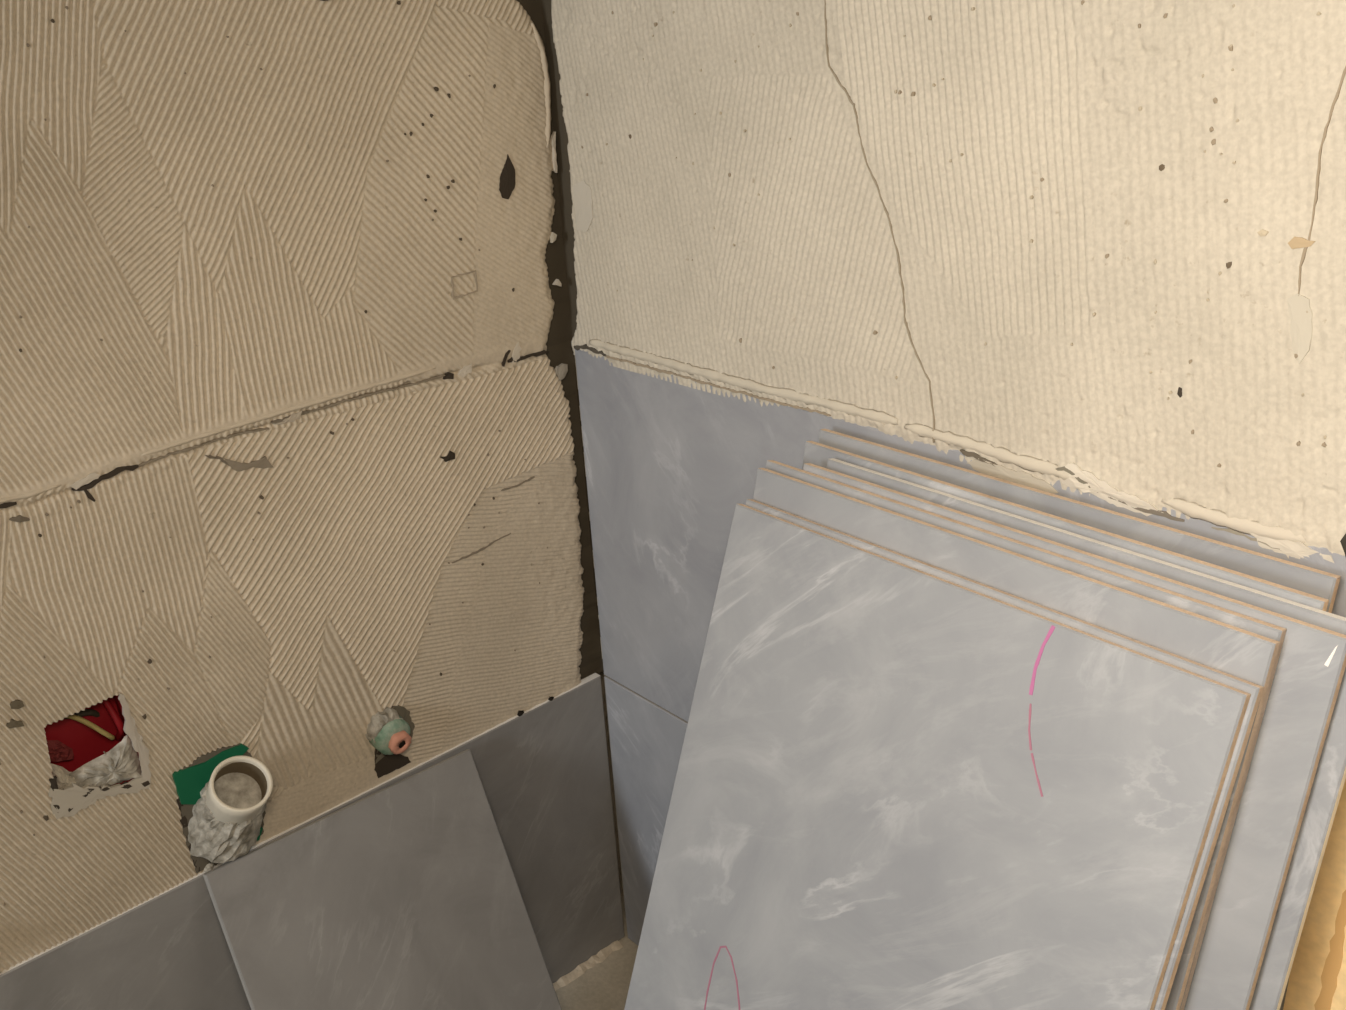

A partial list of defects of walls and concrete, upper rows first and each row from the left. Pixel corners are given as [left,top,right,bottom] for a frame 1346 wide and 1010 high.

crack [824,0,998,466]
crack [1298,66,1346,296]
crack [0,502,30,523]
crack [71,374,445,502]